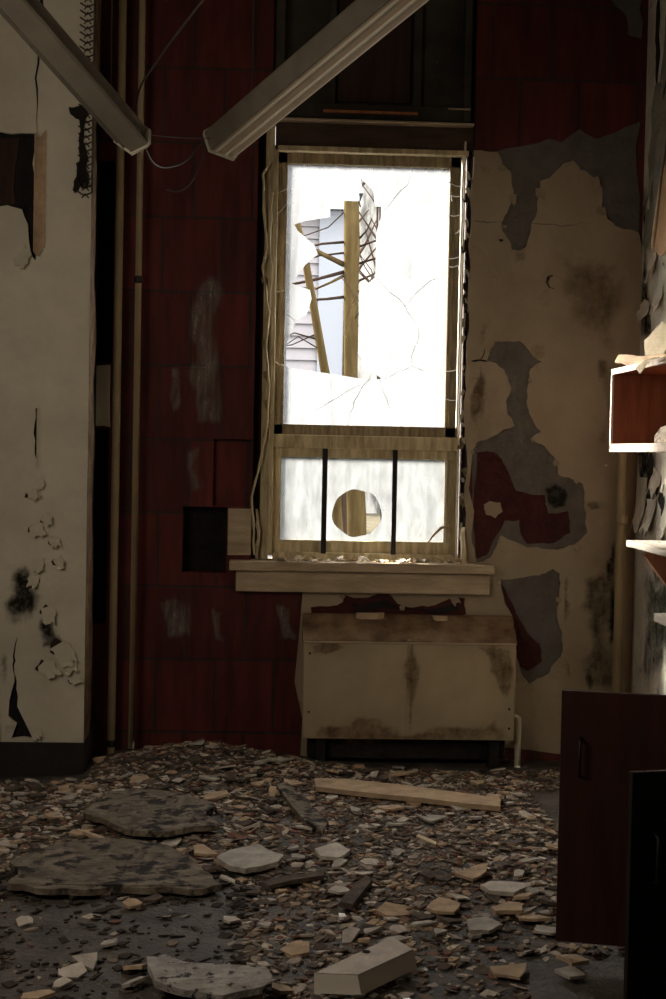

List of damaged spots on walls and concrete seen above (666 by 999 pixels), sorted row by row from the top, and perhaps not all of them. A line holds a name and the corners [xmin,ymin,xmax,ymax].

peeling [463,157,475,203]
flaking render [490,0,666,374]
peeling [461,220,470,343]
flaking render [443,341,588,564]
flaking render [497,569,563,689]